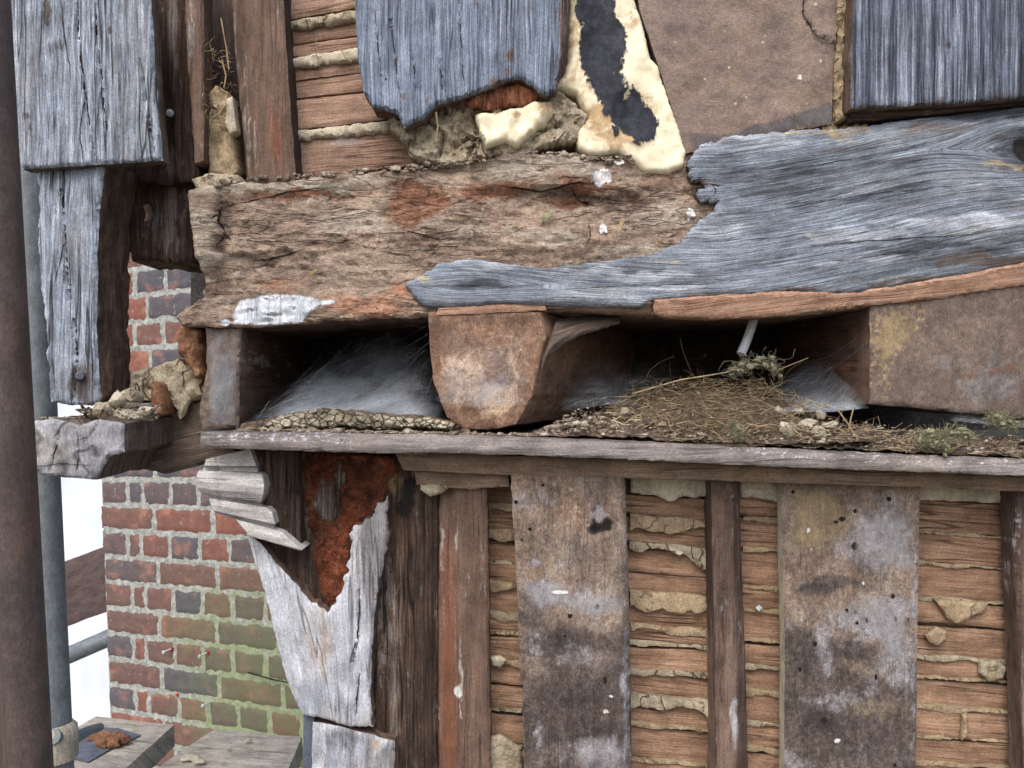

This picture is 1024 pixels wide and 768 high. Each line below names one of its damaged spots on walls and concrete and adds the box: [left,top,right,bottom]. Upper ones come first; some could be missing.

crack [210,187,329,246]
crack [46,421,96,474]
damp [795,490,844,544]